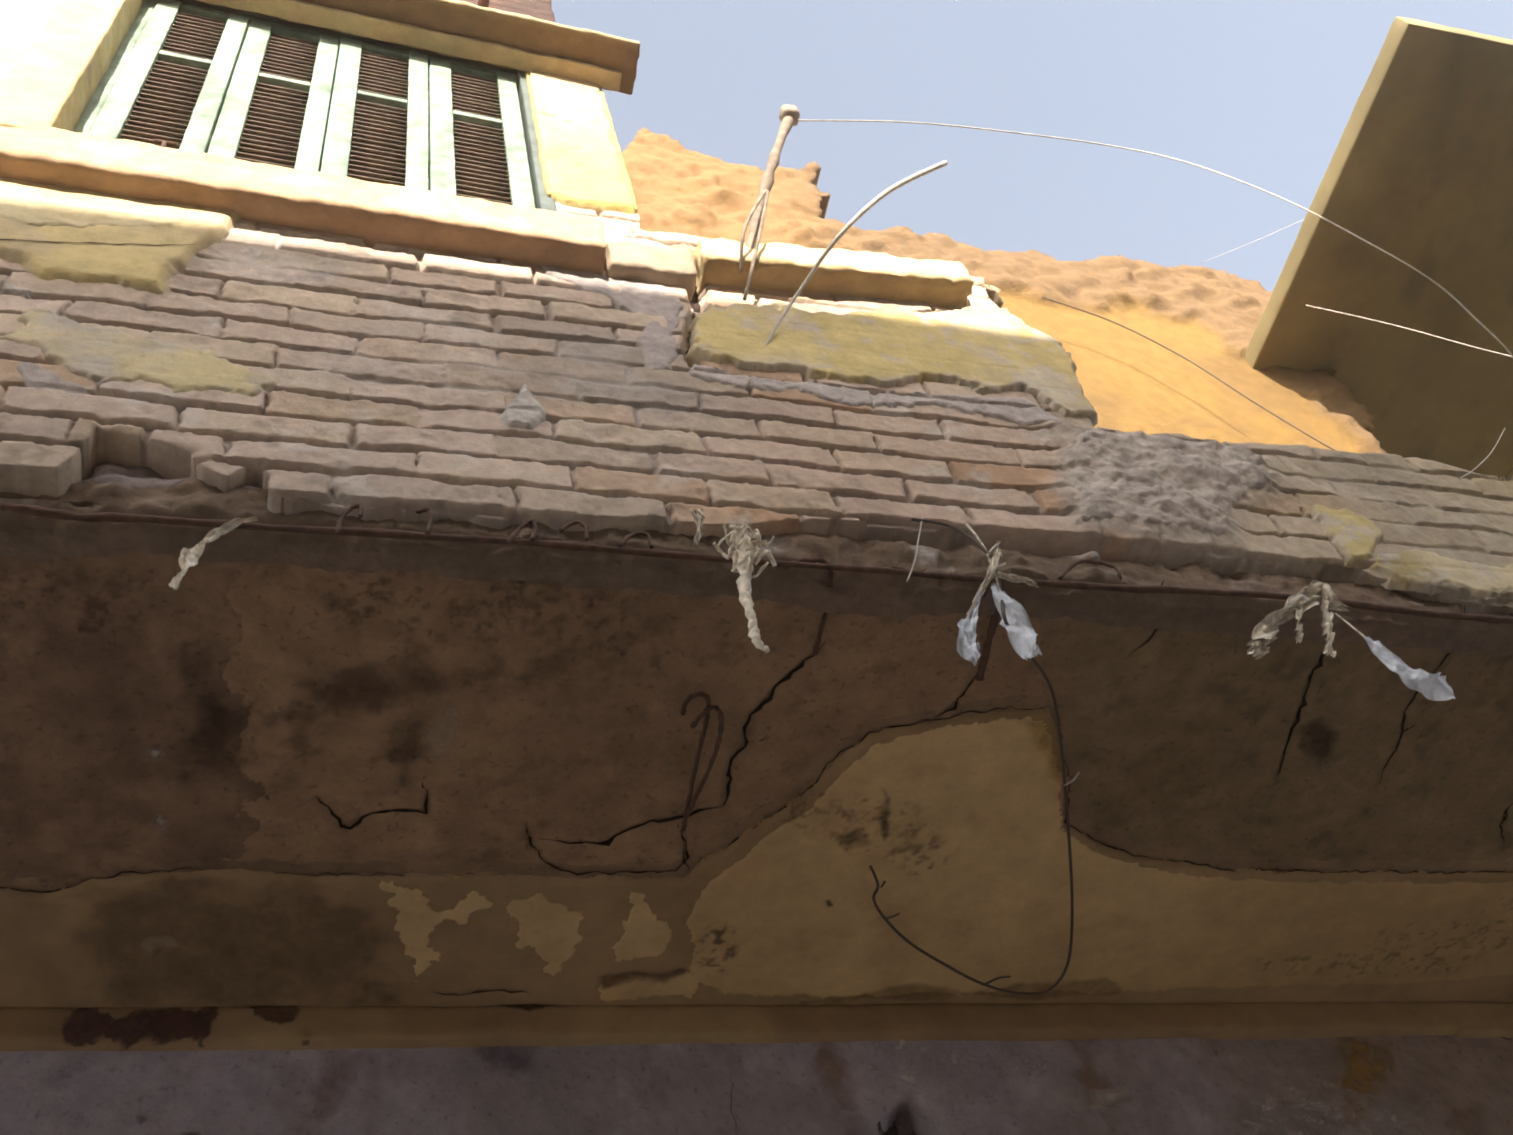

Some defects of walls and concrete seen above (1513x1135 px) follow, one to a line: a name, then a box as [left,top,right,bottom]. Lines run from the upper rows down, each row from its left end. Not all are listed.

peeling [0,308,278,397]
peeling [685,275,1098,426]
spalling [79,461,188,489]
spalling [0,502,733,563]
spalling [753,557,1293,681]
peeling [1310,504,1513,624]
spalling [680,691,724,831]
crack [255,641,1513,876]
crack [0,867,217,893]
peeling [379,881,584,982]
peeling [599,716,1513,1001]